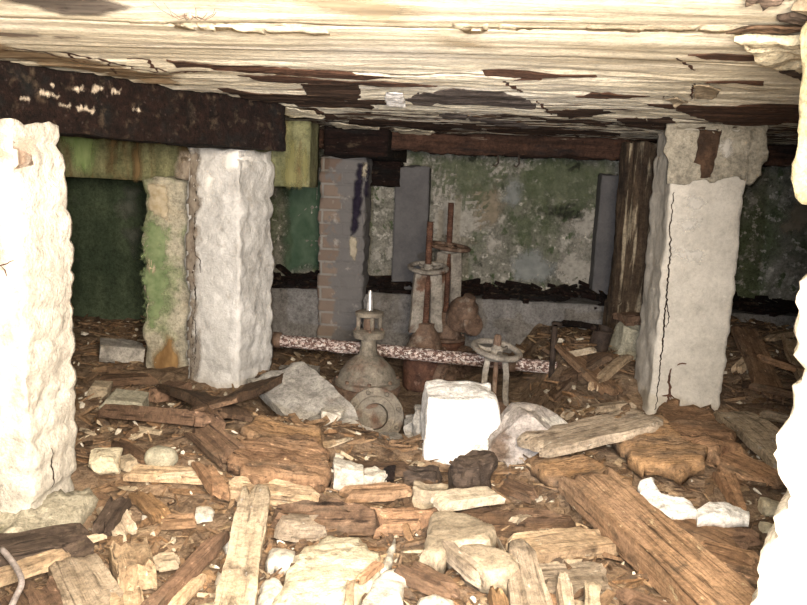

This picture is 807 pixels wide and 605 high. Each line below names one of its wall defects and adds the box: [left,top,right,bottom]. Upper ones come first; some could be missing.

damp [8,0,127,16]
peeling [237,75,438,130]
peeling [468,109,620,136]
damp [555,205,580,219]
crack [654,193,687,410]
rust [153,338,179,368]